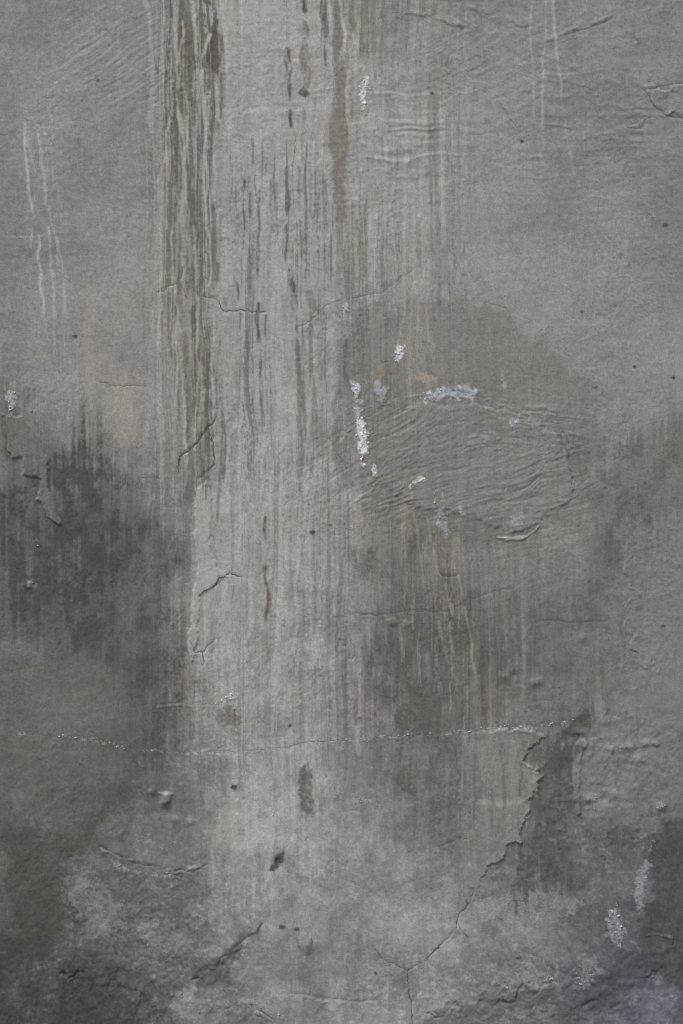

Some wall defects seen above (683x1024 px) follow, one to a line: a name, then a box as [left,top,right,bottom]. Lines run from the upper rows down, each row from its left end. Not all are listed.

damp [210,7,222,83]
damp [213,76,224,133]
damp [141,0,217,478]
crack [142,416,216,479]
damp [306,330,326,477]
crack [377,893,473,1024]